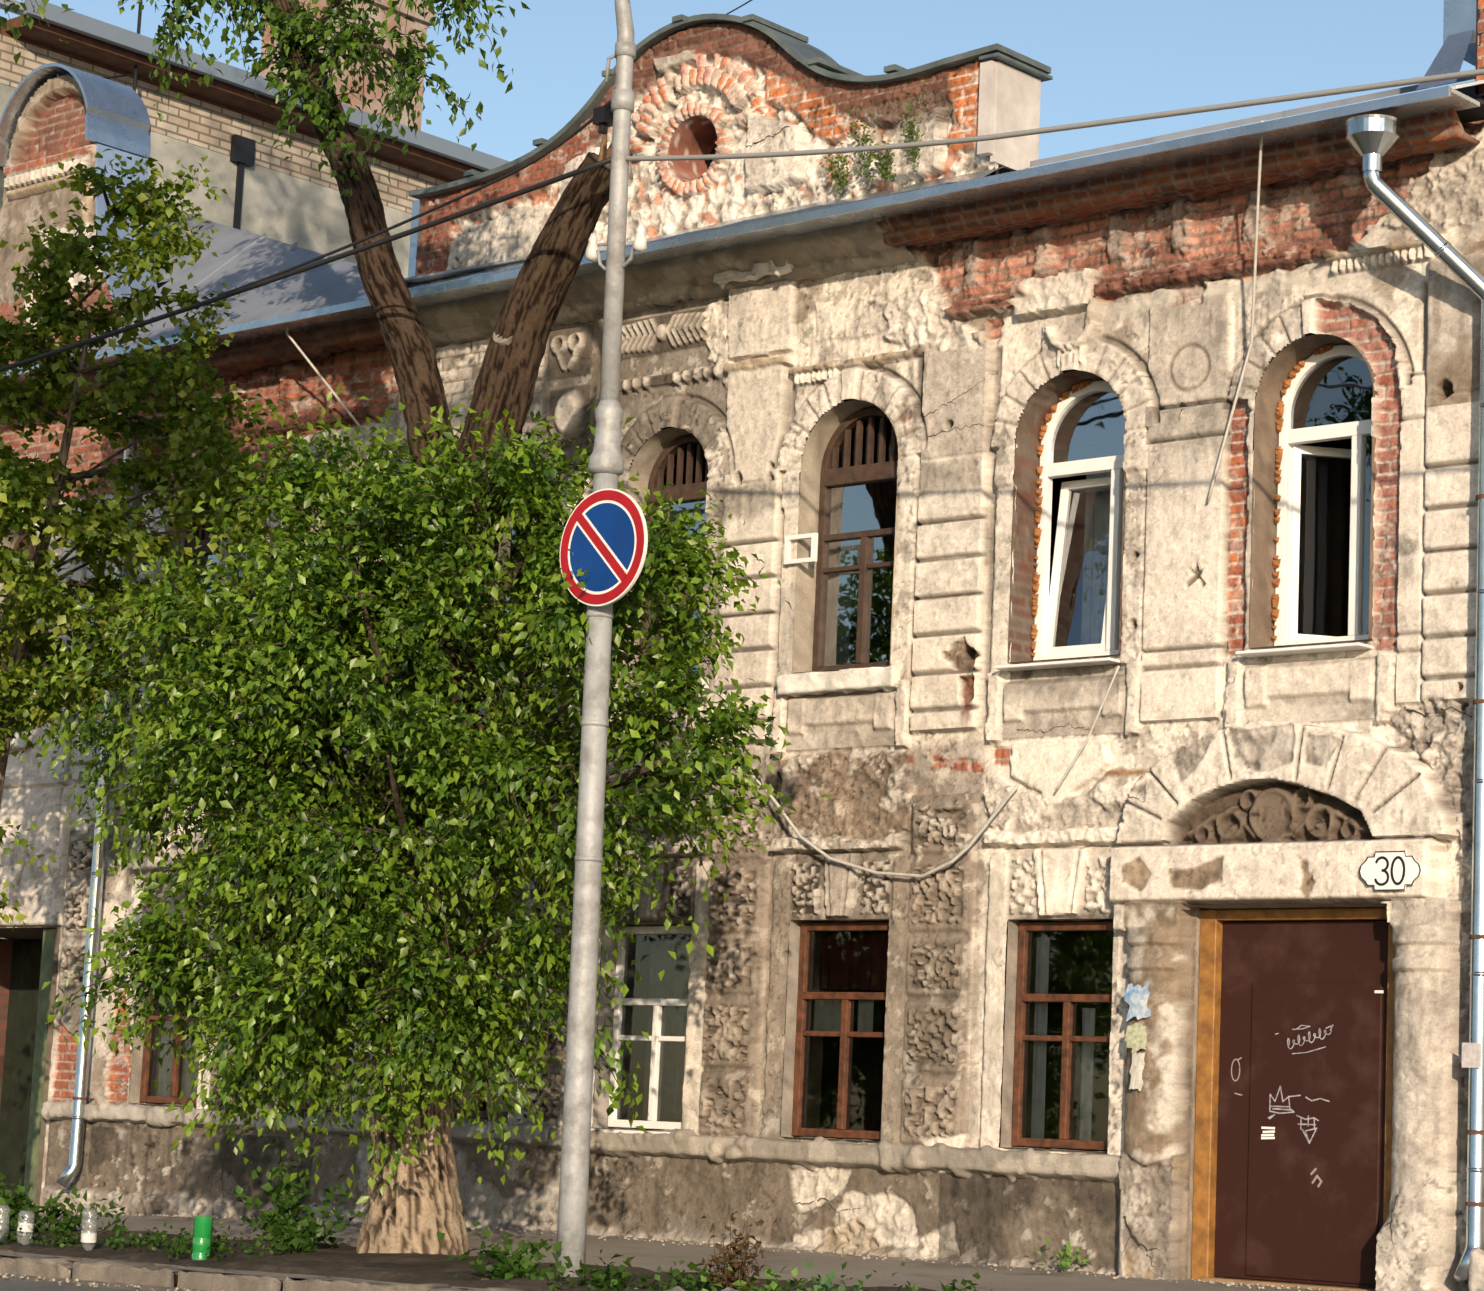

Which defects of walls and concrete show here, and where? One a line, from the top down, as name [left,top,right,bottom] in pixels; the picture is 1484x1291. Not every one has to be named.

flaking render [815,120,1484,352]
flaking render [1227,398,1255,655]
flaking render [1316,298,1404,653]
corrosion [963,677,975,713]